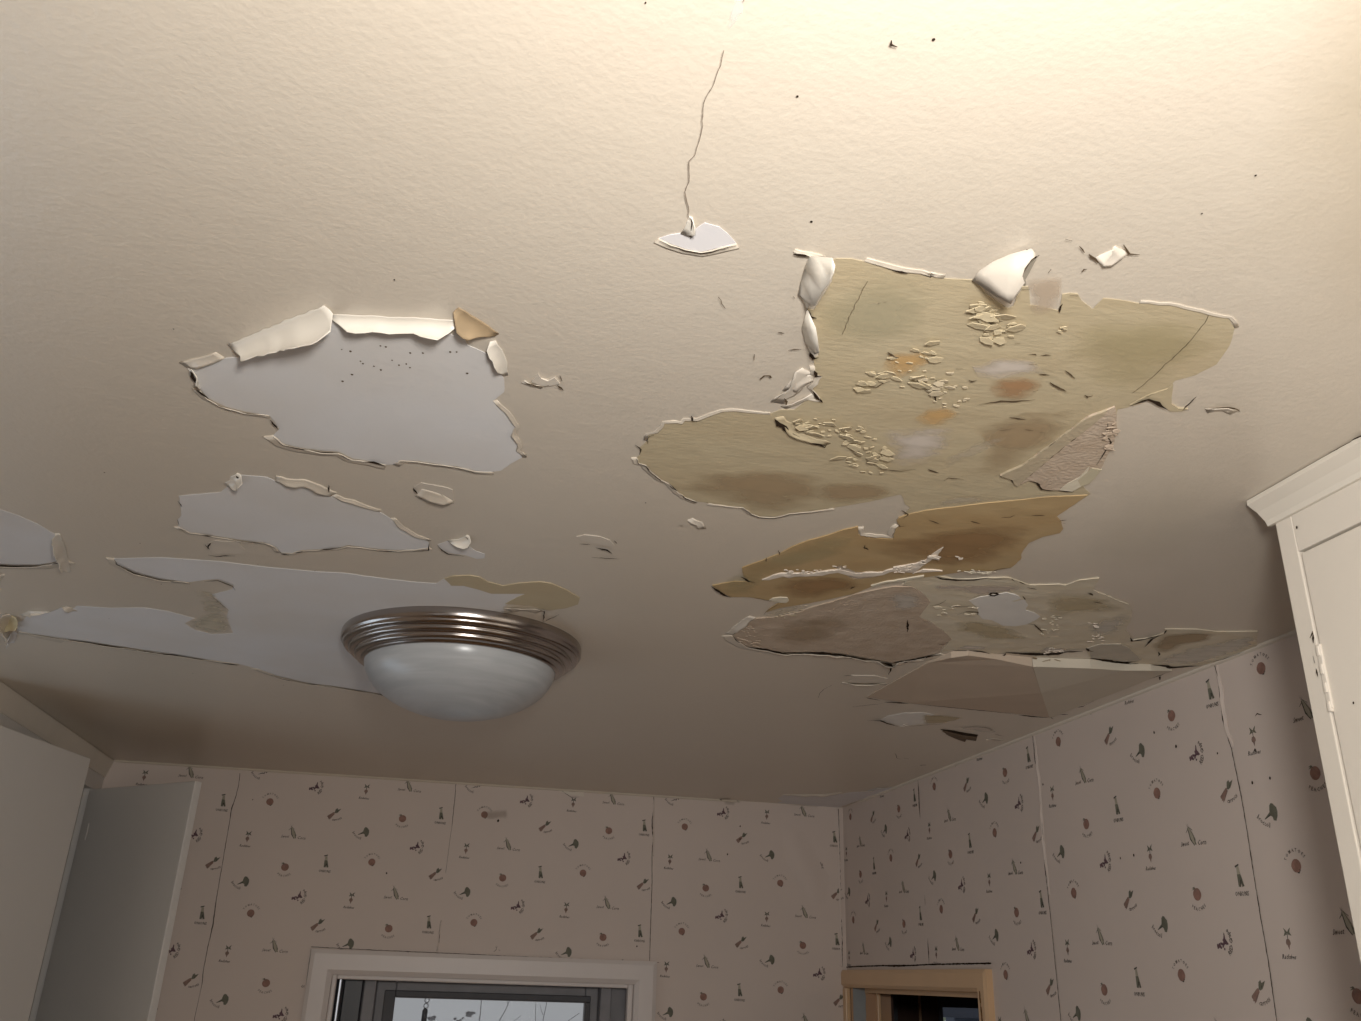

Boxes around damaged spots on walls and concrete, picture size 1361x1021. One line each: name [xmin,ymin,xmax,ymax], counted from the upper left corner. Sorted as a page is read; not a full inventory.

crack [685,50,724,219]
peeling [654,216,739,257]
peeling [179,305,527,475]
peeling [631,248,1258,686]
peeling [0,473,580,696]
peeling [871,713,978,737]